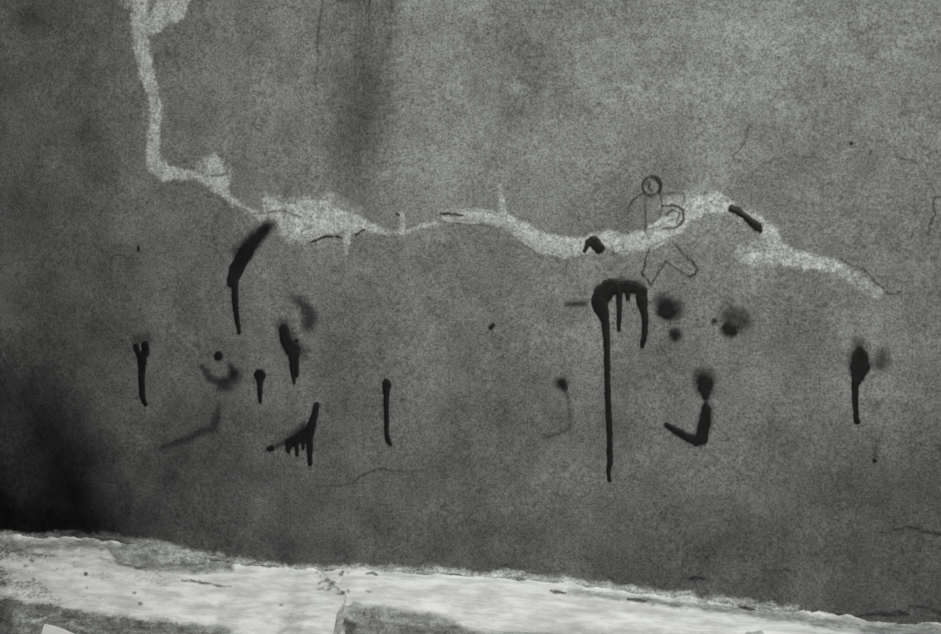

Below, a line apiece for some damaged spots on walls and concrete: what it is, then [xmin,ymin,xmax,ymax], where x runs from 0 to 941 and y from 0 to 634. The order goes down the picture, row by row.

crack [130,0,883,297]